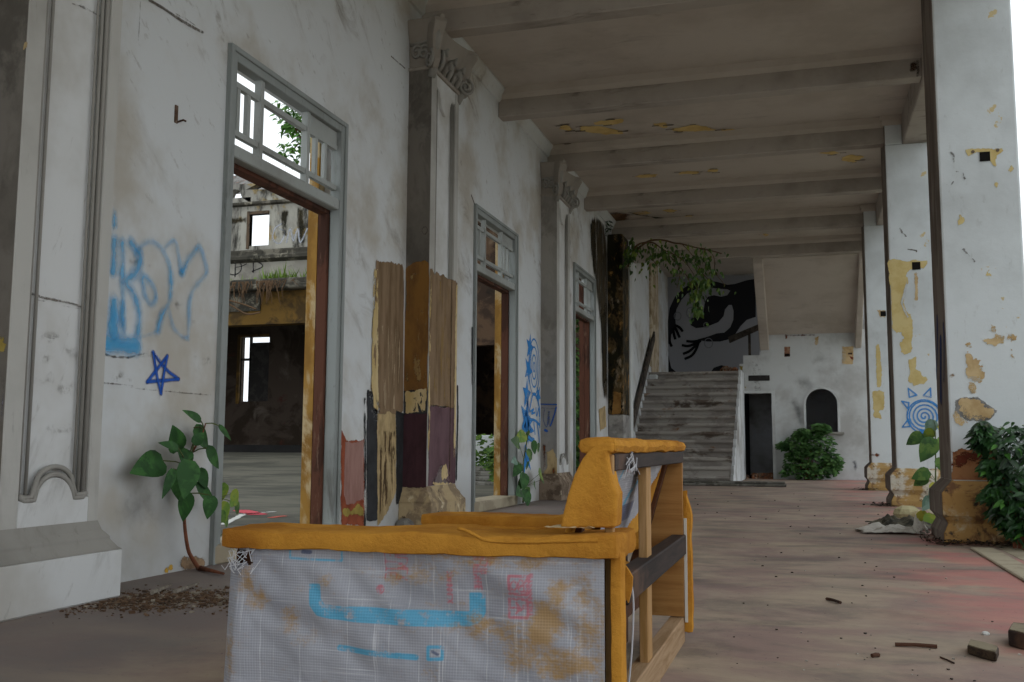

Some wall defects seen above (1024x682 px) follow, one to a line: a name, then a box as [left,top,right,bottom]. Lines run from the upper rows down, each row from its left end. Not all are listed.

peeling [966,148,1003,167]
peeling [877,259,928,386]
peeling [872,344,885,419]
peeling [950,326,1017,426]